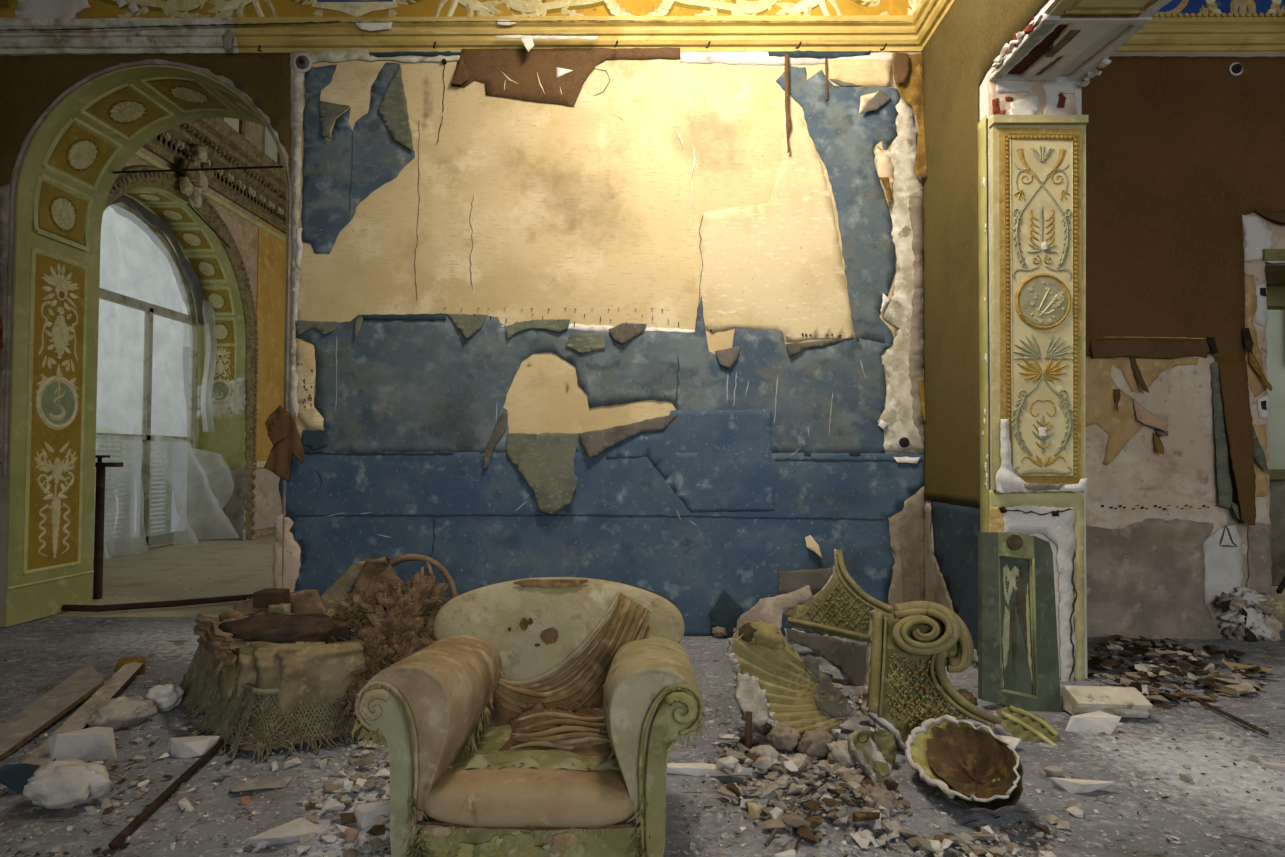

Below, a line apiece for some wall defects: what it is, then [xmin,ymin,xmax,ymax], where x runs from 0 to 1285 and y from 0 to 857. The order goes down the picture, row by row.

peeling [15,0,91,19]
flaking render [680,52,895,65]
flaking render [988,0,1170,118]
flaking render [0,49,460,477]
peeling [874,99,926,464]
flaking render [1242,213,1285,595]
flaking render [272,479,301,592]
flaking render [888,486,954,615]
flaking render [982,355,1228,687]